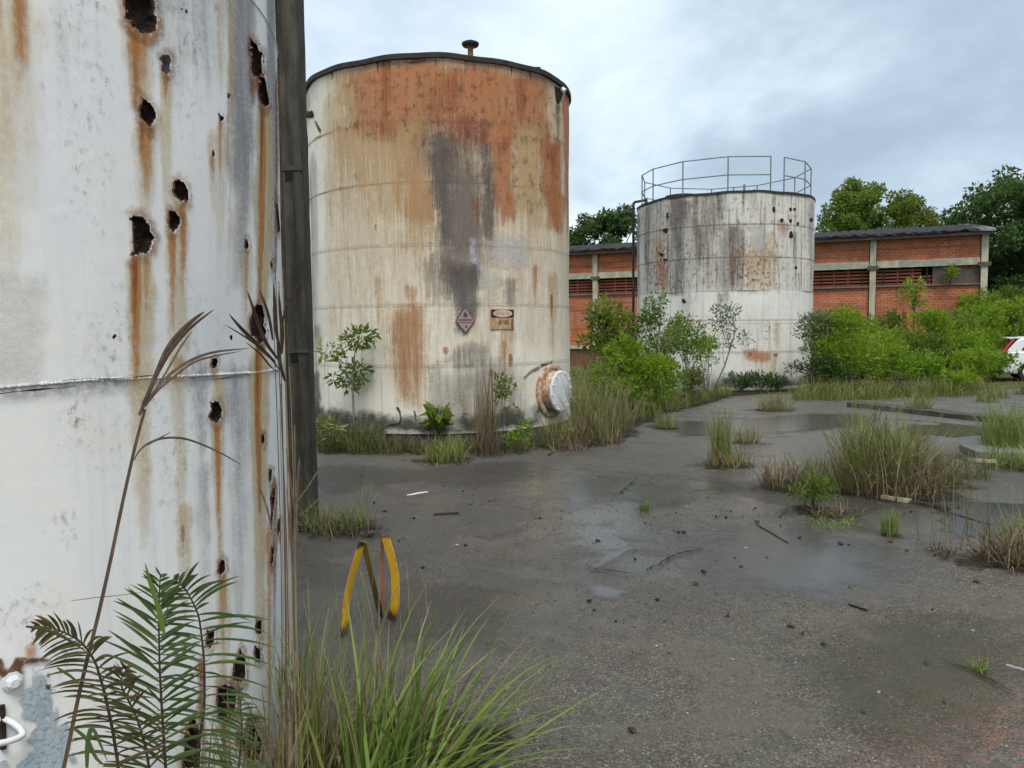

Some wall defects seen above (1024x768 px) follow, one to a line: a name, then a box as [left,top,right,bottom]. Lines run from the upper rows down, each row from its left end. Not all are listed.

corrosion [122,0,192,411]
corrosion [211,0,233,171]
corrosion [307,59,569,249]
leakage [422,137,492,318]
corrosion [210,358,225,514]
corrosion [217,34,282,761]
corrosion [392,307,422,400]
corrosion [747,350,778,370]
corrosion [0,644,51,689]
peeling [0,669,76,768]